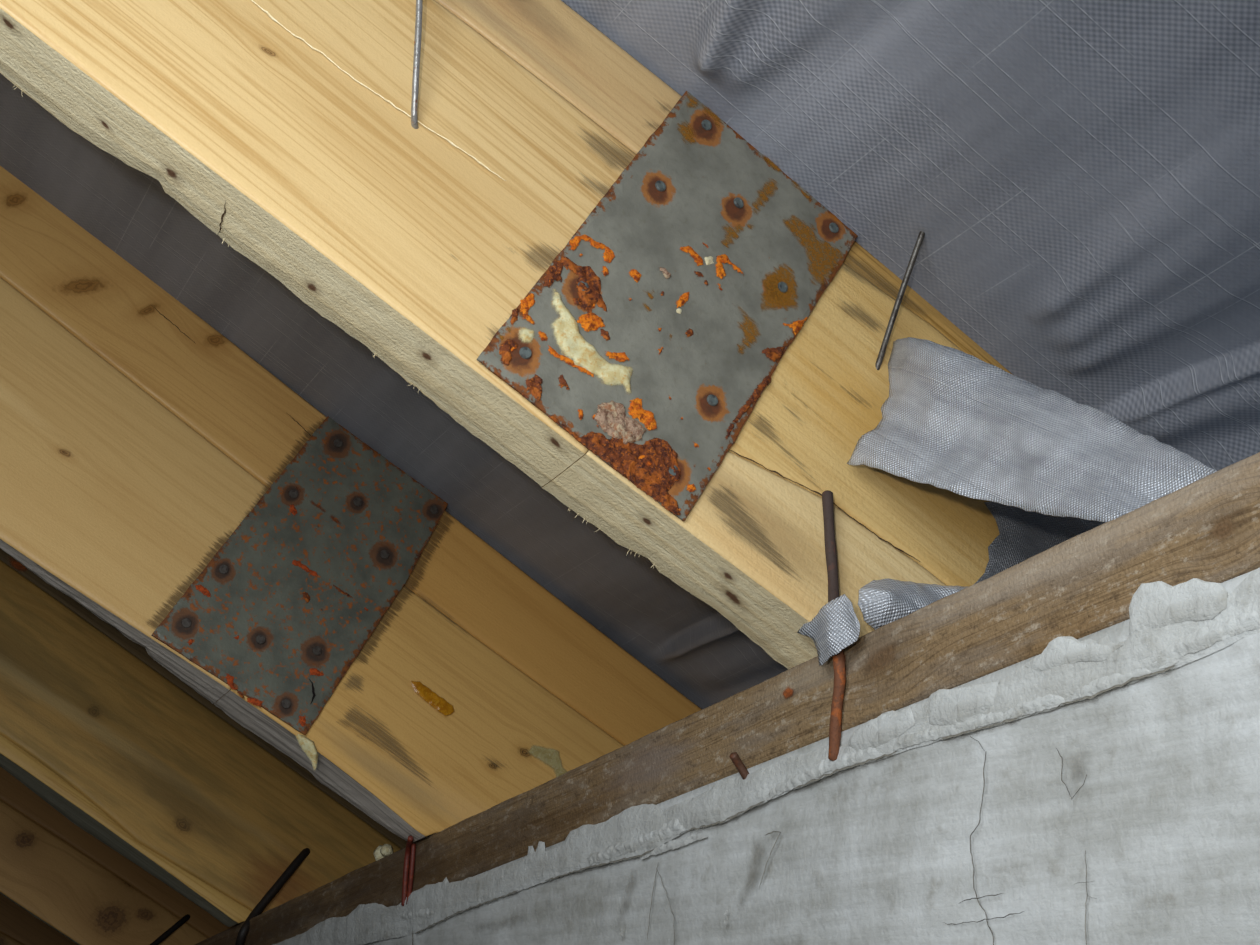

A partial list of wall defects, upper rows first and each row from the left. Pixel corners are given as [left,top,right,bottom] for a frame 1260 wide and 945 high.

corrosion [680,157,781,290]
corrosion [499,234,629,390]
corrosion [629,267,689,314]
corrosion [760,265,807,335]
corrosion [726,312,786,440]
corrosion [548,398,711,515]
crack [1059,665,1175,706]
crack [792,751,897,790]
crack [688,801,781,888]
crack [940,718,1024,945]
crack [412,891,517,945]
crack [545,849,675,944]